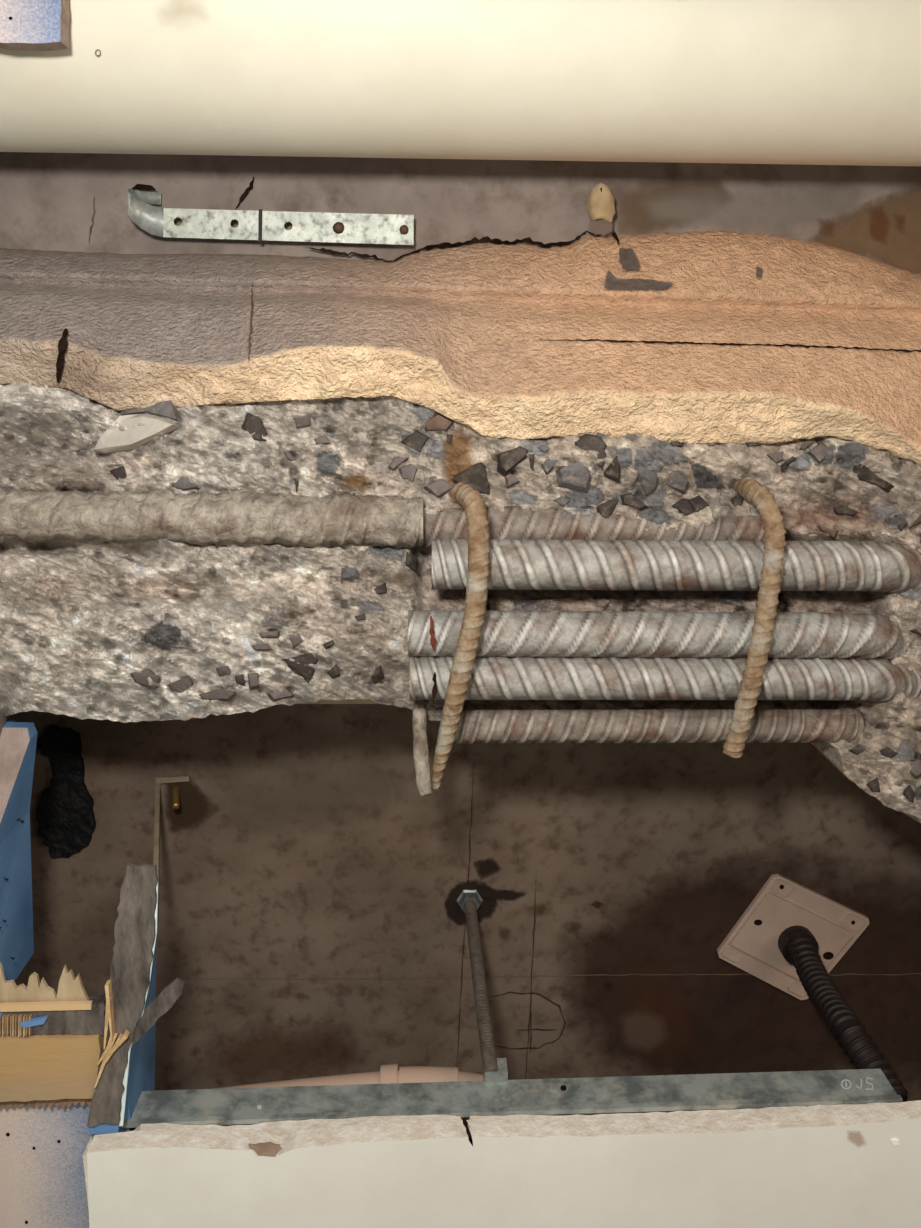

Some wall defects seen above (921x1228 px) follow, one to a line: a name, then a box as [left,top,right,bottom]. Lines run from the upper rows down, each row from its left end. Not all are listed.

crack [305,229,619,262]
leakage [620,183,921,274]
crack [537,338,921,352]
spalling [0,382,921,554]
spalling [0,536,466,723]
spalling [486,590,758,612]
spalling [462,700,736,710]
spalling [754,588,921,823]